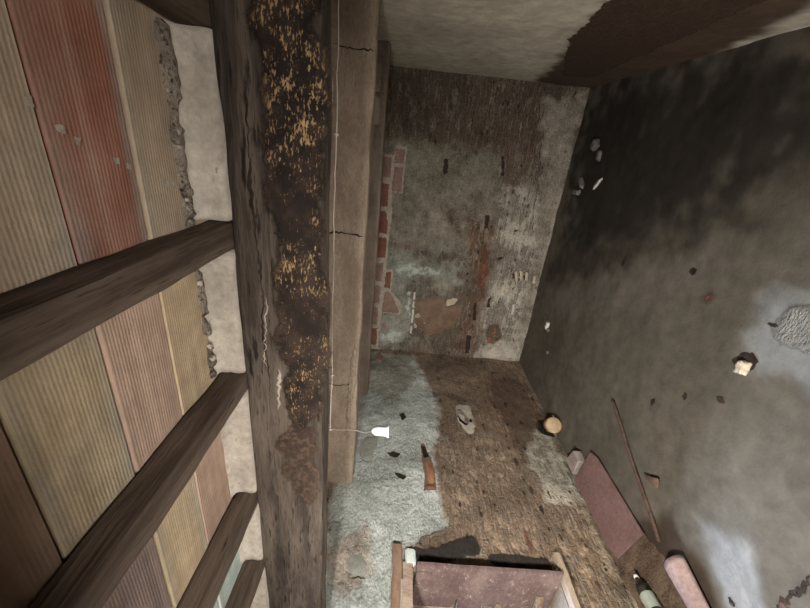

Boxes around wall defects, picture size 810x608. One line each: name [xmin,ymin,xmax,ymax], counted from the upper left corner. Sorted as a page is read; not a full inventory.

crack [334,43,373,51]
crack [776,575,810,608]